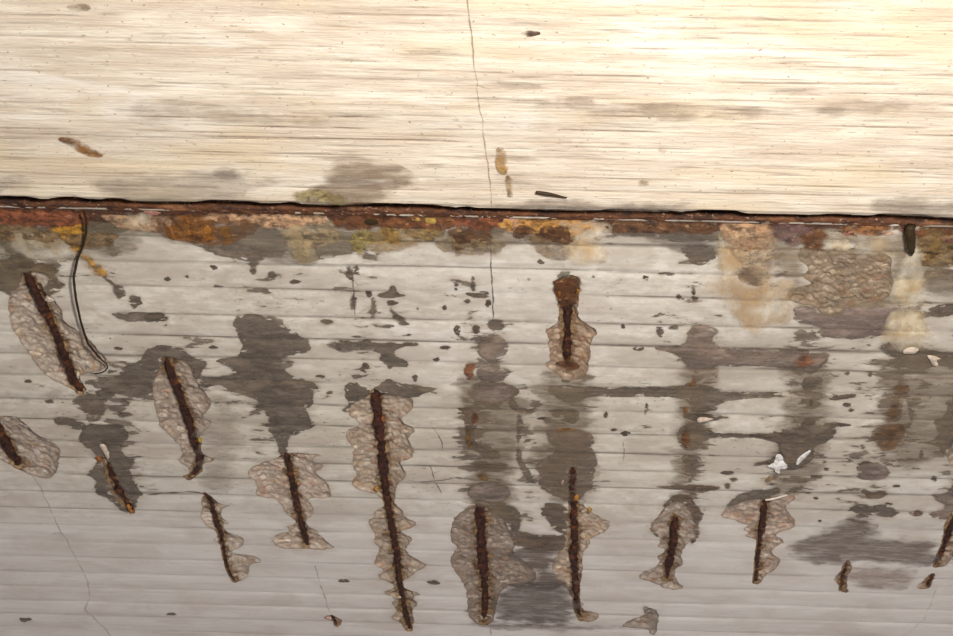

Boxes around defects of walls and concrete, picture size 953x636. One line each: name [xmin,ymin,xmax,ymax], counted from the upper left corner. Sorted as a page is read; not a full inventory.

corrosion [0,189,953,277]
crack [488,247,496,317]
damp [568,224,605,262]
damp [647,230,806,329]
spalling [787,247,953,369]
damp [819,230,953,339]
spalling [0,237,437,631]
damp [460,372,593,522]
spalling [450,275,856,625]
damp [483,547,581,629]
damp [792,518,939,588]
peeling [849,461,953,589]